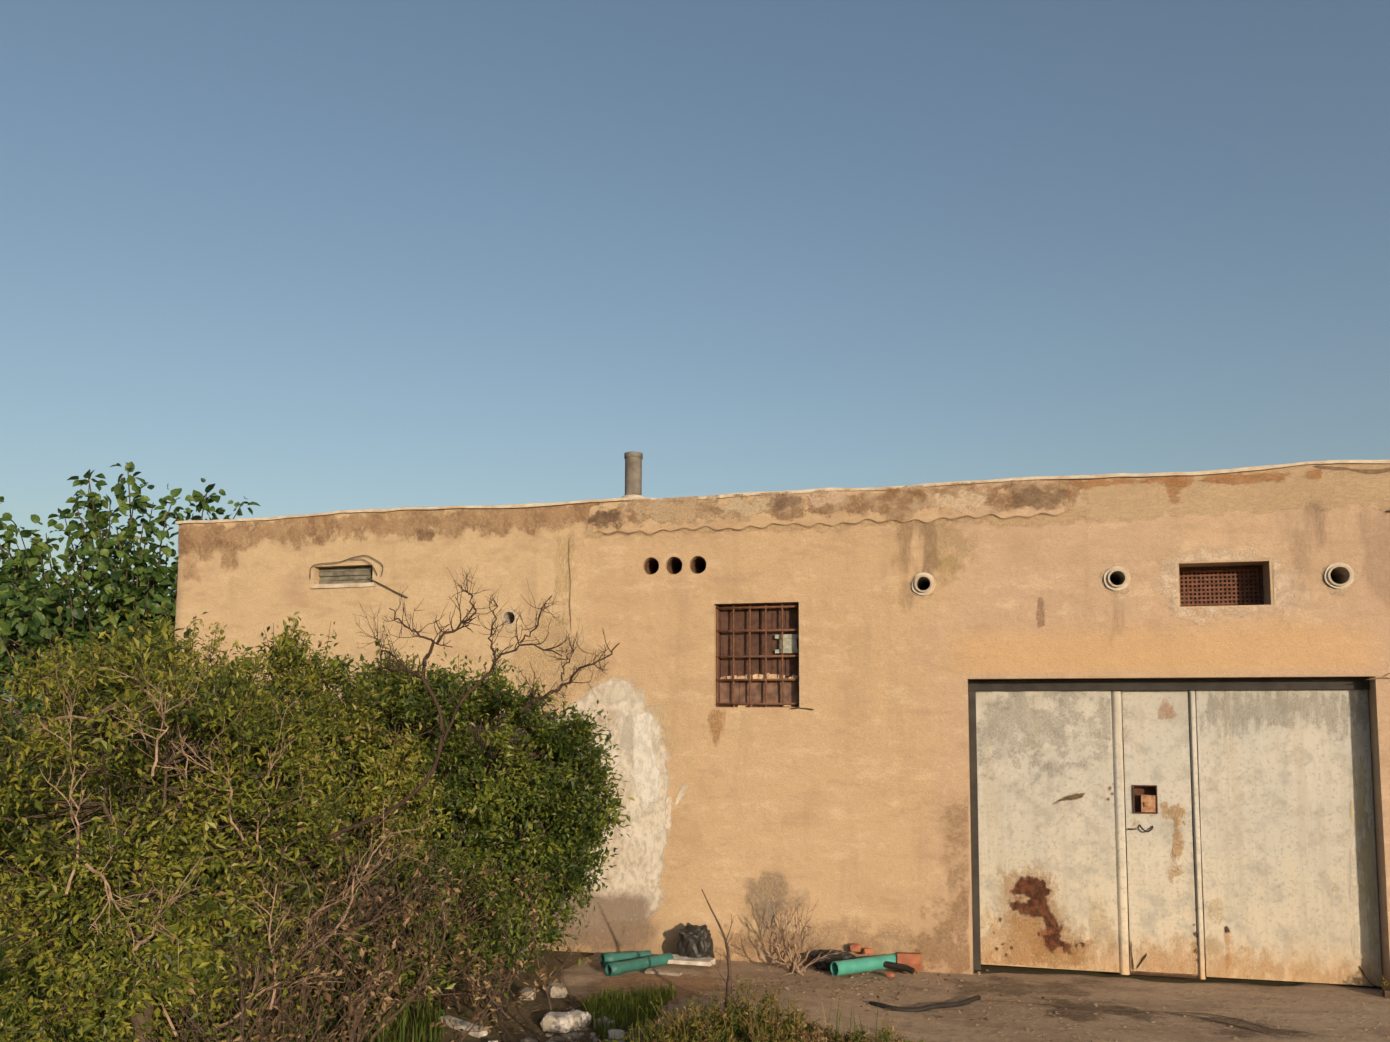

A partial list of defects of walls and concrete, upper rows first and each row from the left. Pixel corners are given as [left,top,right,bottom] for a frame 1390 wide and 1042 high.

leakage [178,464,1390,598]
crack [568,511,1066,687]
peeling [543,678,687,949]
rust [1151,803,1185,857]
rust [993,876,1085,956]